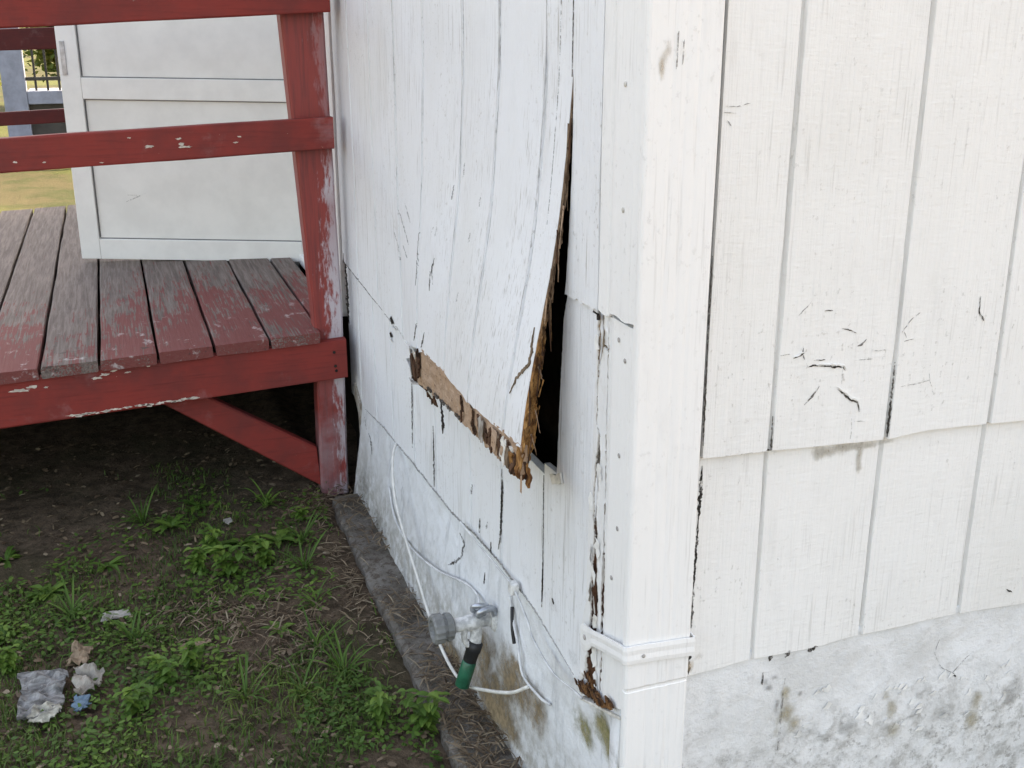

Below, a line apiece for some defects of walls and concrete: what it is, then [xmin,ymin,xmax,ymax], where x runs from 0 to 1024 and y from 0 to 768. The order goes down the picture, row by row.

spalling [405,340,528,475]
crack [783,310,866,422]
water stain [442,641,460,669]
water stain [475,632,545,741]